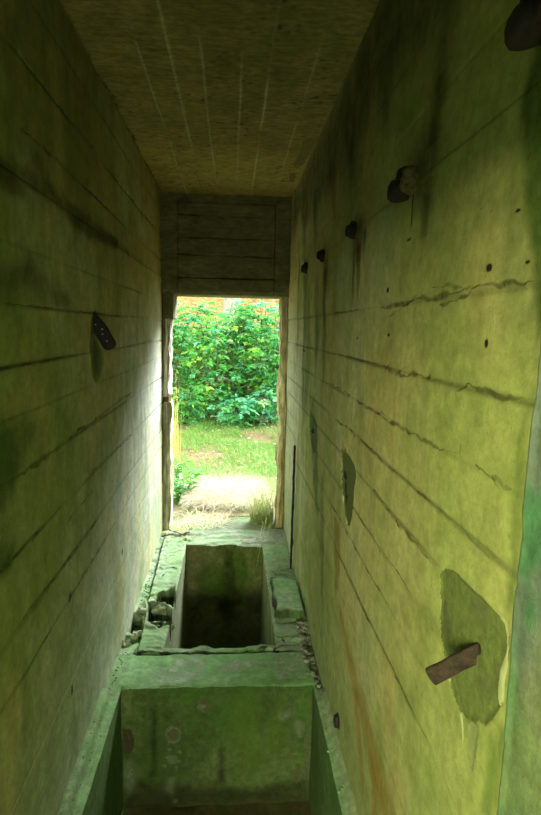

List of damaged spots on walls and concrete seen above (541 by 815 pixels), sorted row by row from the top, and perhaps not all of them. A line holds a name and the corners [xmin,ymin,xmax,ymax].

crack [498,280,529,288]
spalling [309,412,318,454]
spalling [341,449,356,526]
spalling [82,544,342,815]
spalling [440,568,510,772]